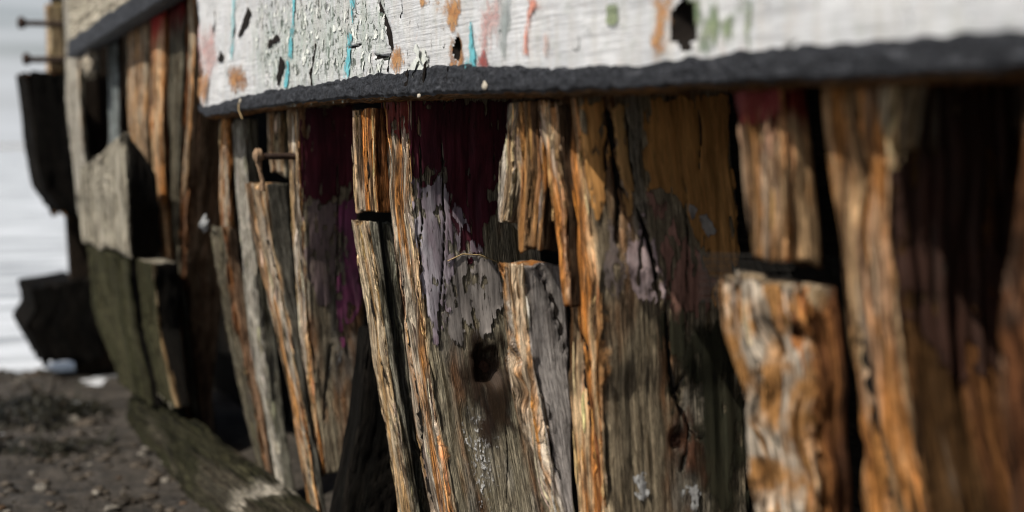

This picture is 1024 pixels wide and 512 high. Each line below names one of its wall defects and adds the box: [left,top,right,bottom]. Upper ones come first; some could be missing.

peeling [238,0,386,88]
peeling [410,44,429,74]
spalling [452,37,462,62]
peeling [606,3,618,26]
spalling [670,0,697,52]
rust [255,161,265,191]
peeling [381,98,512,347]
crack [603,101,702,470]